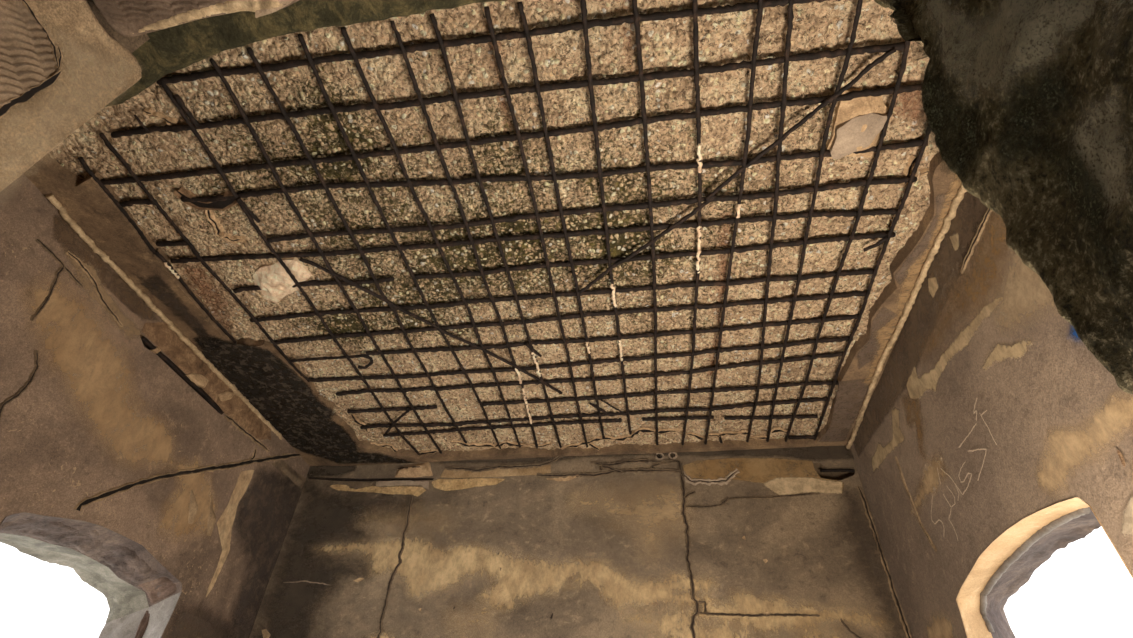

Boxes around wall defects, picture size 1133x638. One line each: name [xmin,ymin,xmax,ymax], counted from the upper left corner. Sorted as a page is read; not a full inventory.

spalling [49,0,938,452]
crack [30,239,123,327]
leakage [997,254,1054,327]
crack [0,350,39,423]
peeling [872,297,1003,471]
crack [73,414,301,511]
peeling [308,465,577,497]
crack [351,414,861,638]
spalling [813,463,855,481]
crack [857,486,912,638]